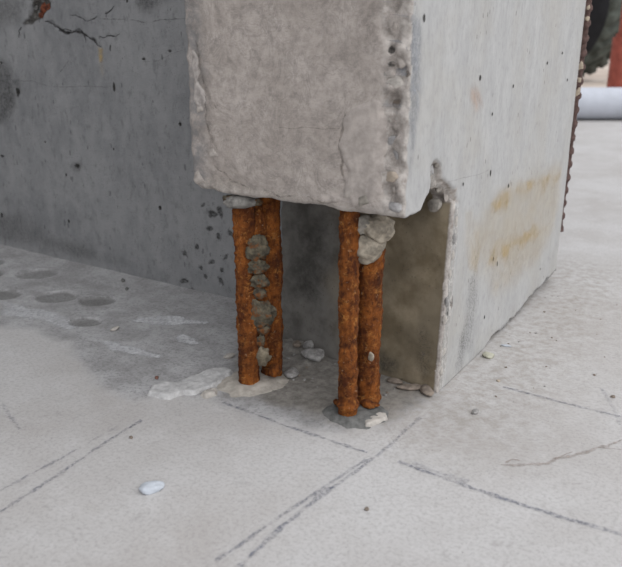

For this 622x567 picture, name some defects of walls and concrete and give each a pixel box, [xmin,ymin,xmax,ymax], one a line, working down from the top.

crack [45,6,119,51]